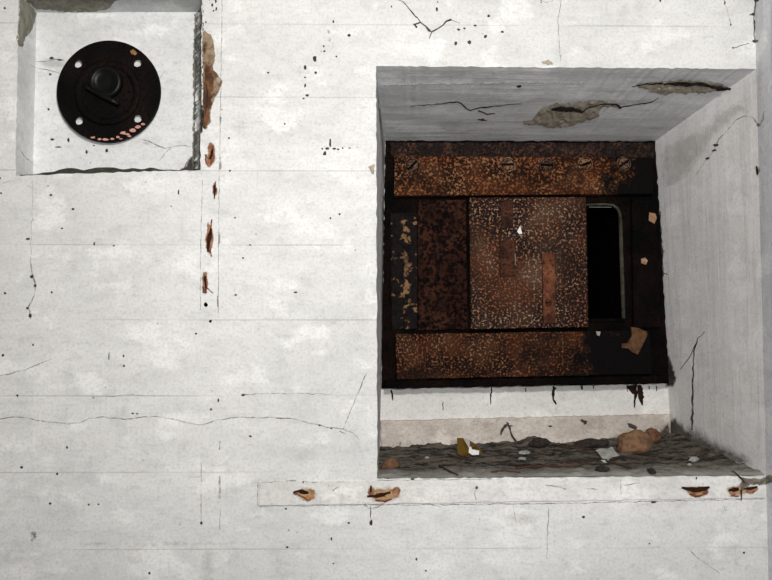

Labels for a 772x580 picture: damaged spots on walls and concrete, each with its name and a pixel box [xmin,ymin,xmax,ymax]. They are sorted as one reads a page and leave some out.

crack [399,0,459,39]
spalling [523,80,731,128]
rust [205,142,215,167]
rust [202,272,213,293]
spalling [731,470,772,500]